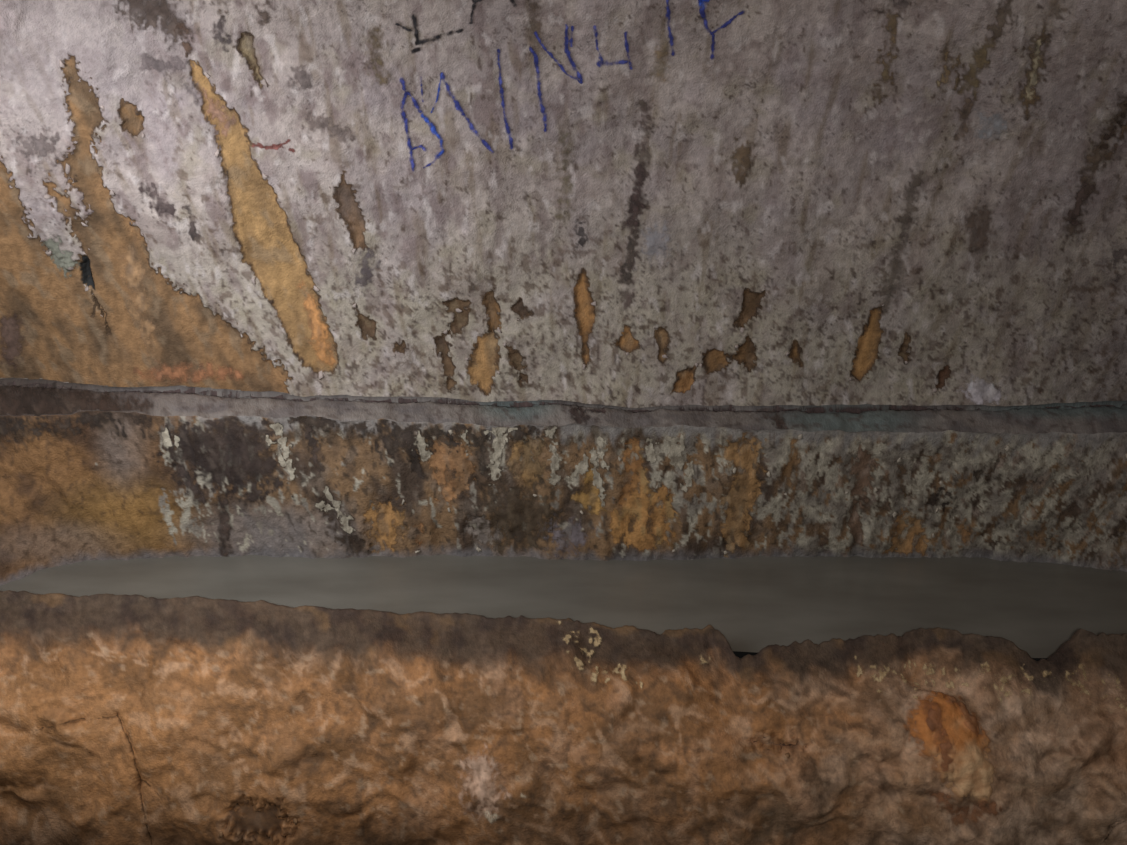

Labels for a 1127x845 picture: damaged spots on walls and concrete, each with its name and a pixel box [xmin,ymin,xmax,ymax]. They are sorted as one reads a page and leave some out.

peeling [236,32,268,88]
peeling [0,55,293,393]
peeling [186,55,339,380]
damp [1064,97,1127,239]
peeling [433,291,534,395]
peeling [573,268,597,370]
peeling [654,327,670,363]
peeling [672,288,765,393]
peeling [849,304,884,381]
damp [0,382,589,559]
damp [597,436,610,471]
crack [39,713,158,845]